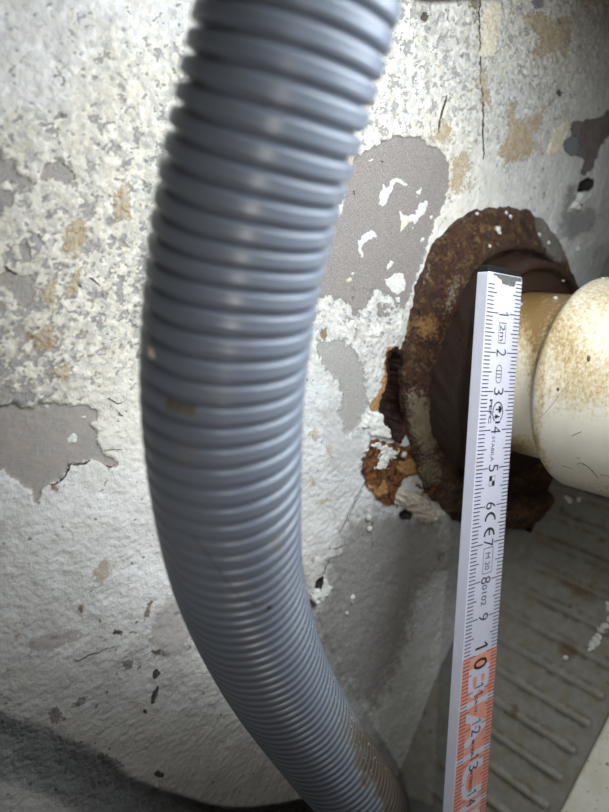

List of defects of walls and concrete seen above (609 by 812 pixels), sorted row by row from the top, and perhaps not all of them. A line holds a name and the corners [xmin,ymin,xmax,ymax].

crack [477,0,485,159]
peeling [547,110,609,211]
peeling [319,135,449,338]
peeling [317,331,408,444]
peeling [0,402,118,503]
rust [360,438,440,507]